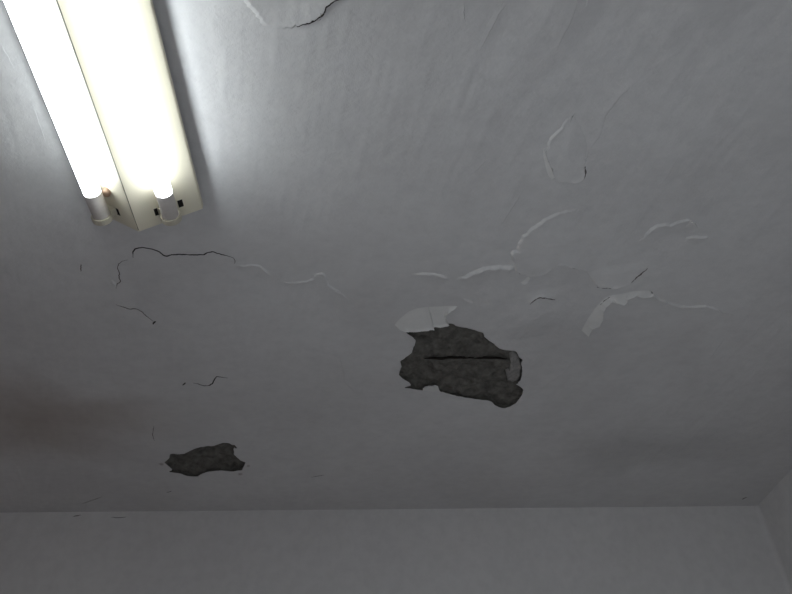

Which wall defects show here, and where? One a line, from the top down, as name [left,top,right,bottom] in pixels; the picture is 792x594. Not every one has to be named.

flaking render [244,0,338,29]
crack [117,247,235,284]
spalling [392,306,531,411]
spalling [159,440,251,479]